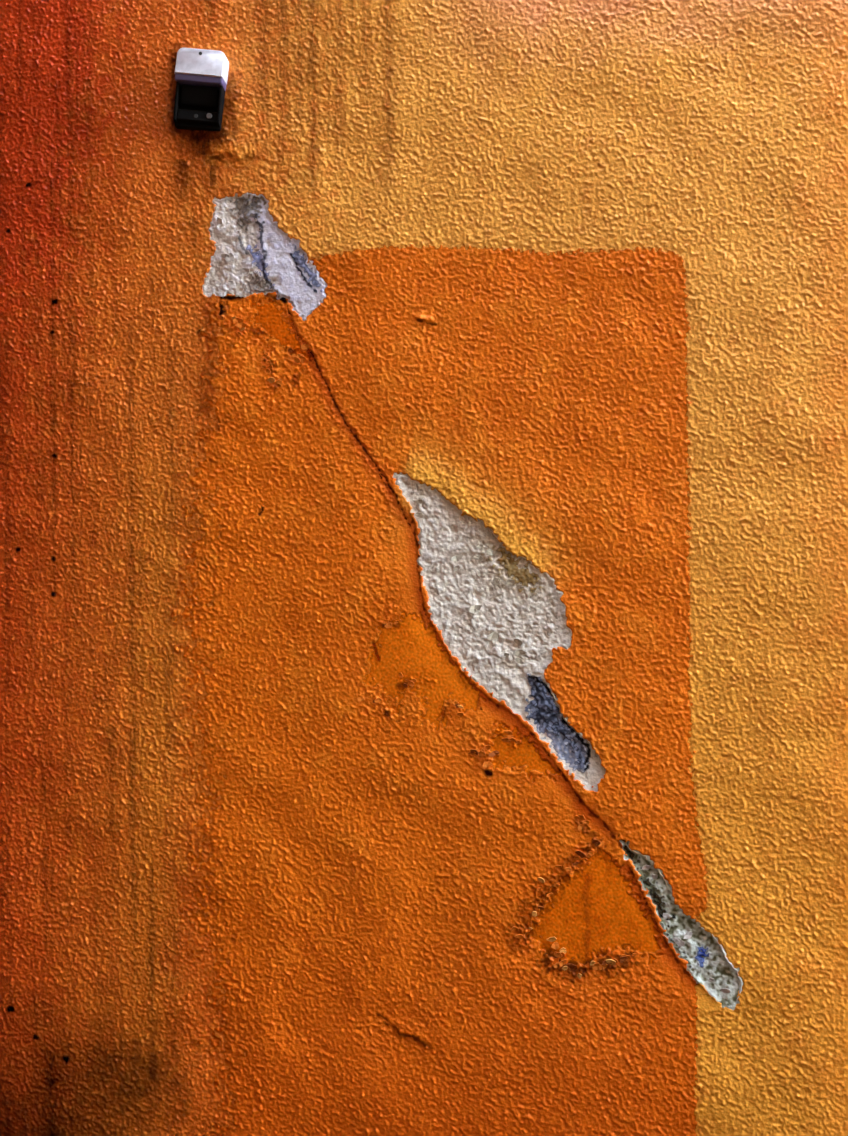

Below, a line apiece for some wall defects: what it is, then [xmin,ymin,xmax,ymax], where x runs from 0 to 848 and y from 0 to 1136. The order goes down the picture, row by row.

flaking render [202,193,327,385]
crack [276,295,436,630]
flaking render [357,472,606,792]
peeling [511,839,744,1010]